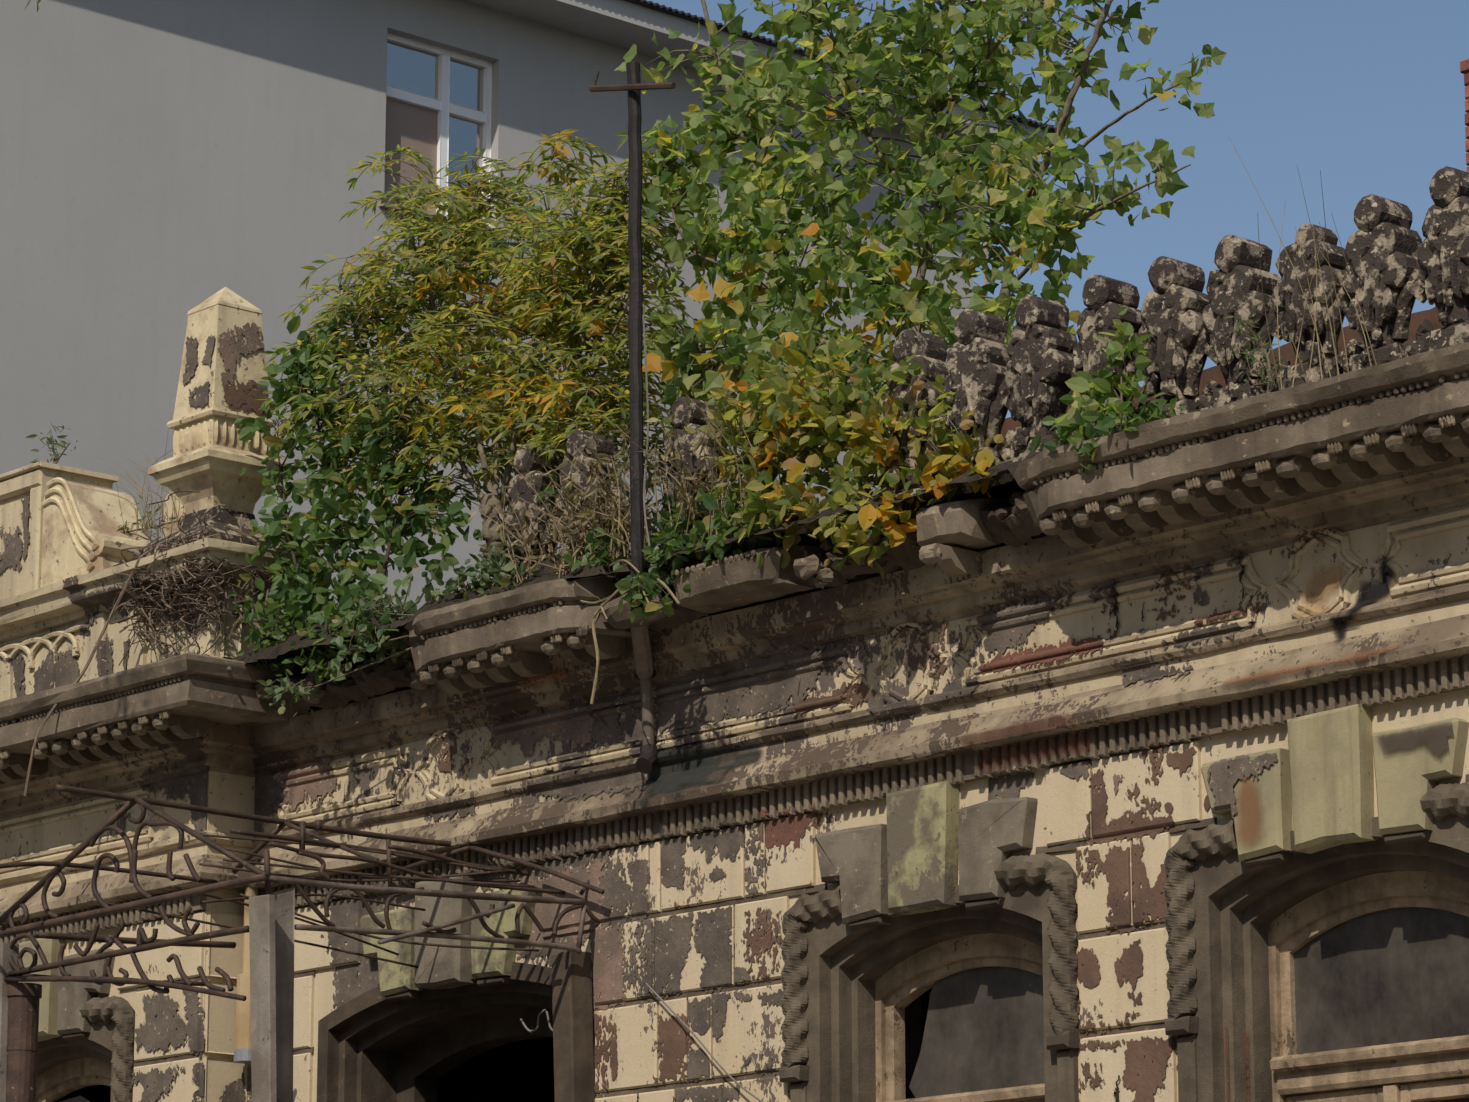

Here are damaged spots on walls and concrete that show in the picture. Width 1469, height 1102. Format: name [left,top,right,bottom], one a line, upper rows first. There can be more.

peeling [183,322,270,416]
peeling [0,496,31,574]
peeling [489,552,1261,801]
peeling [252,750,339,843]
peeling [432,730,461,775]
peeling [424,798,476,821]
peeling [318,803,823,1102]
peeling [1059,741,1278,1102]
peeling [132,990,252,1102]